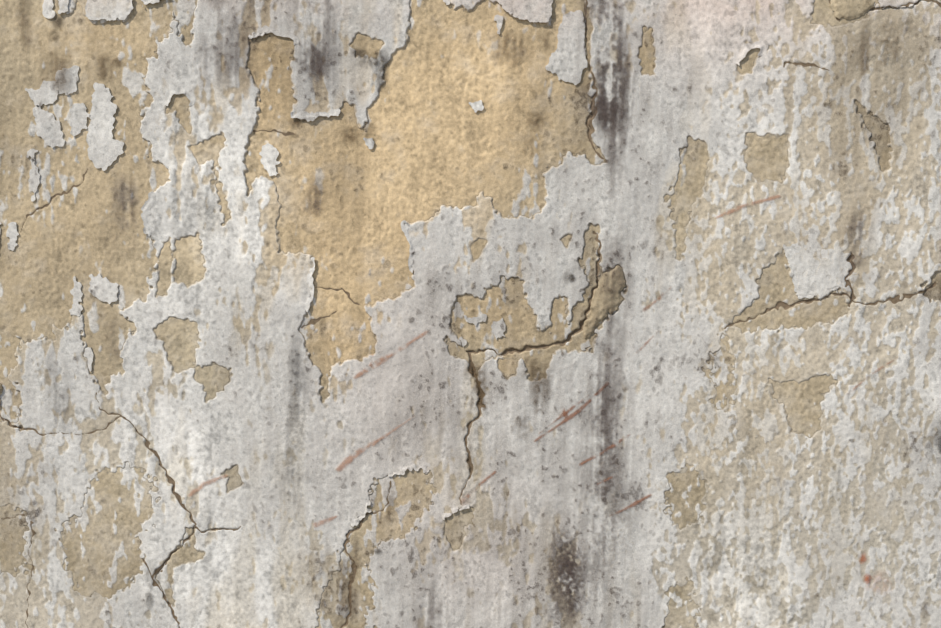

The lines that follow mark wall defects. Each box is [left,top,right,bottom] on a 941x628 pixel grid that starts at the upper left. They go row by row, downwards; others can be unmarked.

crack [870,0,941,11]
damp [599,51,626,164]
peeling [0,0,206,431]
peeling [244,0,626,402]
peeling [154,317,230,401]
crack [459,231,602,504]
crack [724,253,936,329]
peeling [55,462,160,598]
crack [0,392,241,628]
crack [341,481,392,628]
peeling [316,462,437,628]
damp [550,548,576,611]